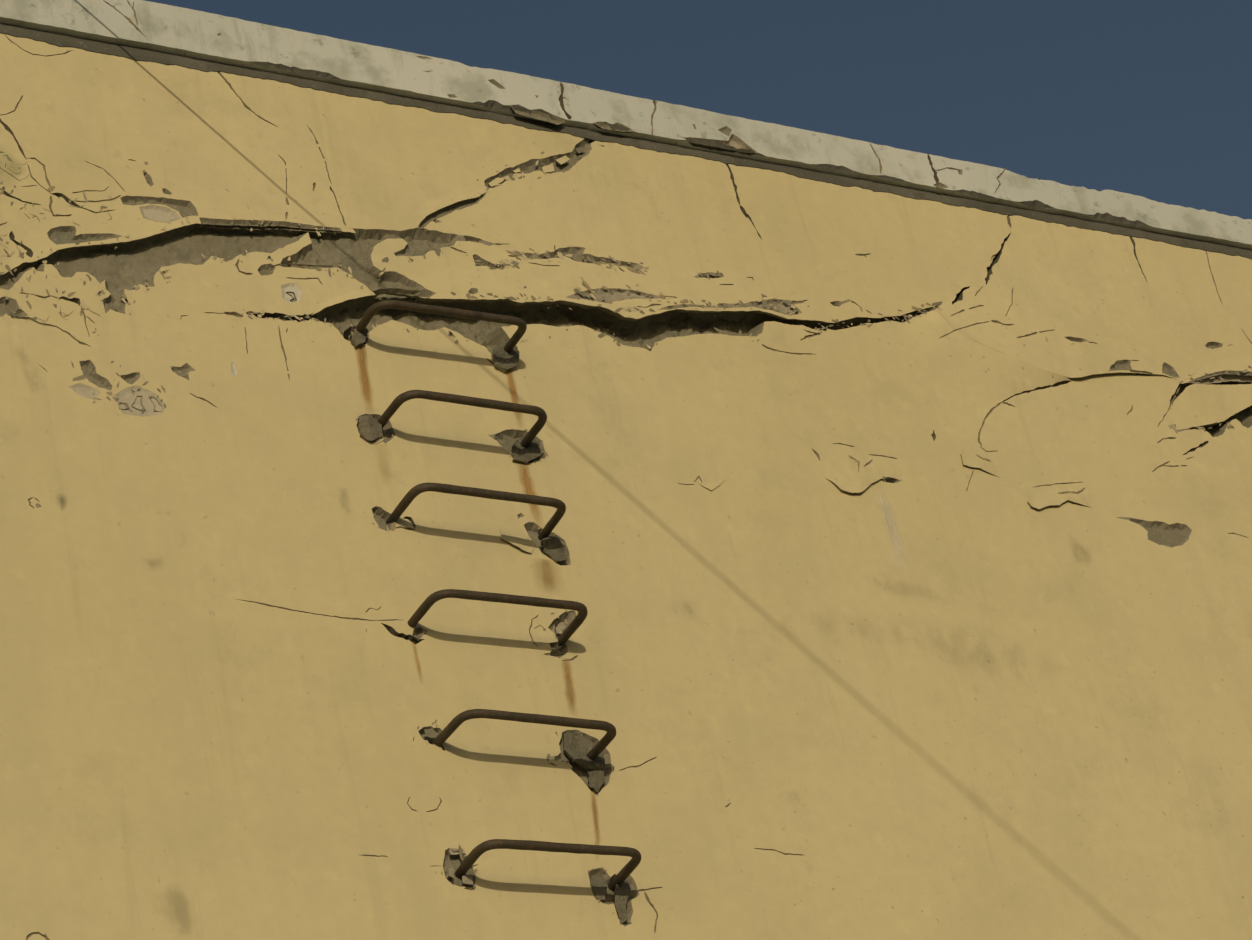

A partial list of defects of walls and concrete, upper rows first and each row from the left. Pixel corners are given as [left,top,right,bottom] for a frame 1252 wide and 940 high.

crack [103,0,143,34]
flaking render [47,226,120,244]
crack [0,72,1055,380]
flaking render [473,245,649,275]
flaking render [0,235,166,417]
rust [358,344,370,399]
rust [508,370,517,403]
crack [977,380,1070,446]
flaking render [1117,517,1192,548]
crack [237,599,397,621]
rust [565,663,573,703]
spalling [546,730,656,796]